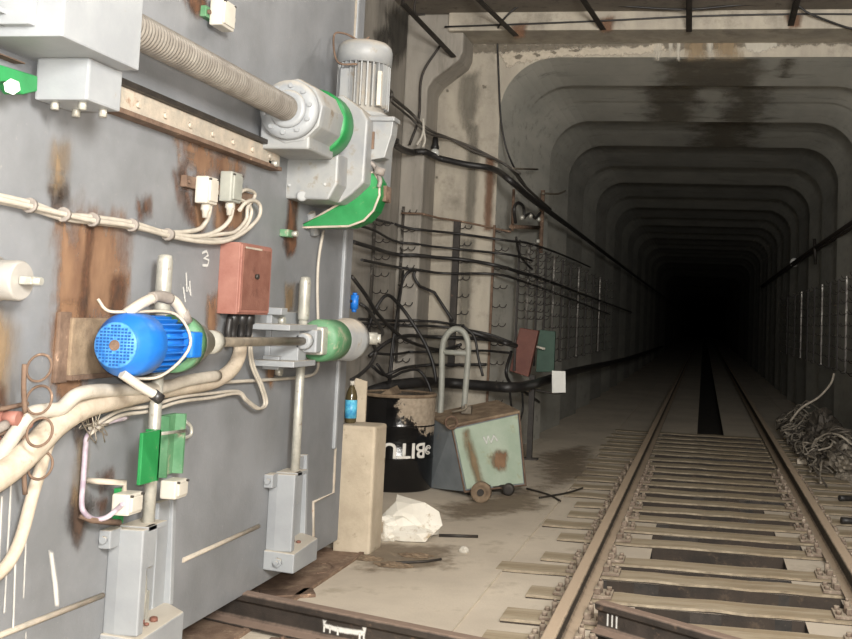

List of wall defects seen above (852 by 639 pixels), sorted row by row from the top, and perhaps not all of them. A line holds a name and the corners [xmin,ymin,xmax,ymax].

spalling [499,43,671,68]
damp [473,43,852,148]
rust [174,142,245,237]
rust [52,220,130,357]
rust [56,380,81,398]